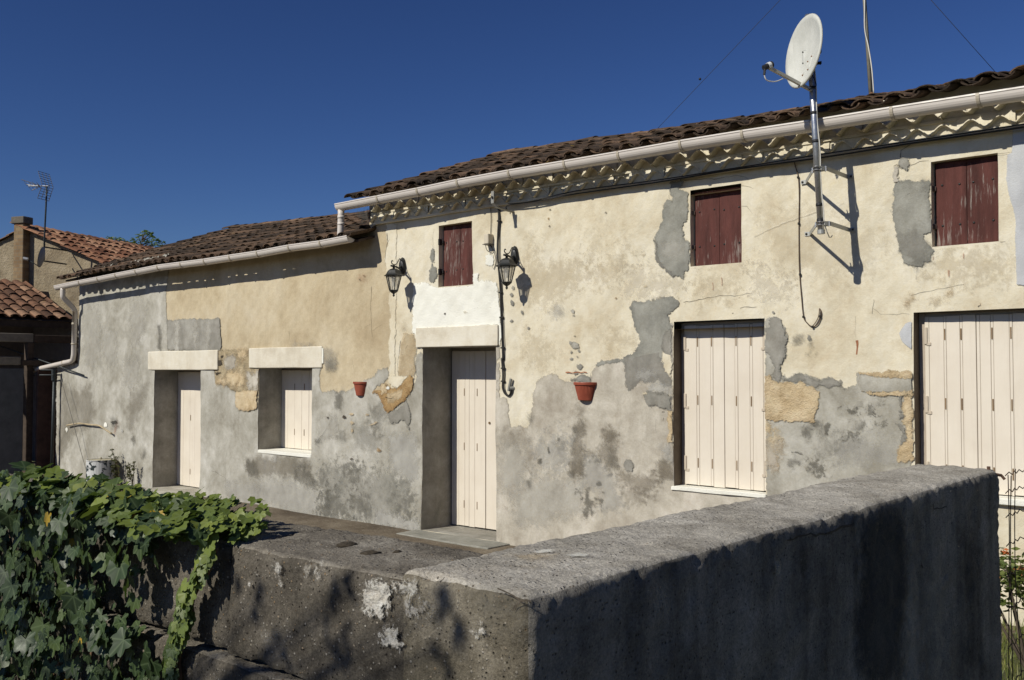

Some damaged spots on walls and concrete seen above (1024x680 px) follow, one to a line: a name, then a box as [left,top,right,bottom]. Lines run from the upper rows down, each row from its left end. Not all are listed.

peeling [372,223,416,413]
spalling [215,348,259,412]
water stain [642,390,671,411]
peeling [661,352,673,377]
flaking render [764,375,820,471]
flaking render [896,393,914,464]
water stain [532,434,621,518]